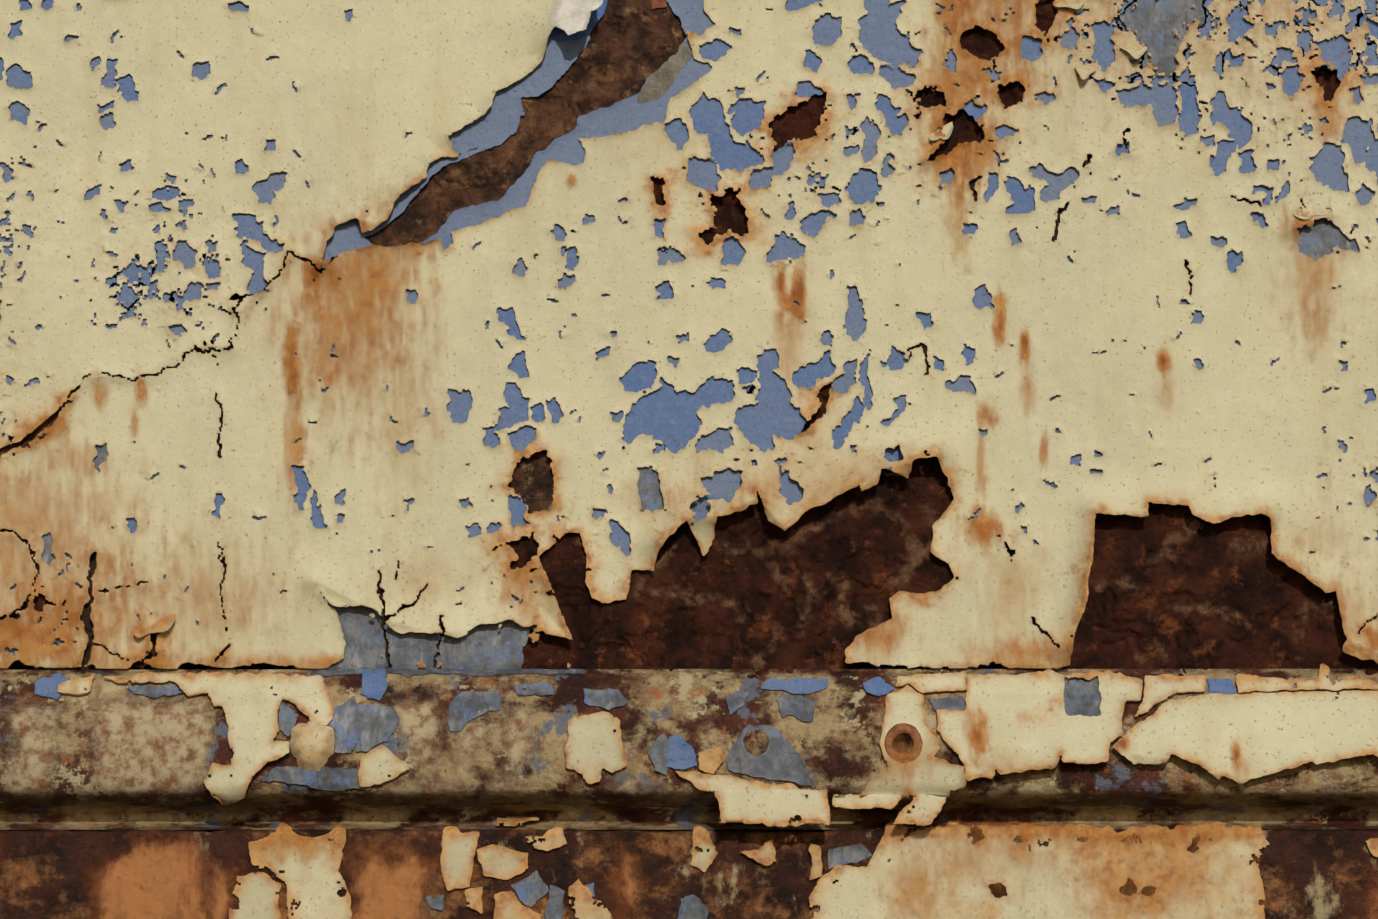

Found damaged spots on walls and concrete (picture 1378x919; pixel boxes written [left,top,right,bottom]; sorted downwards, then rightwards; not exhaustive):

peeling [320,0,800,269]
corrosion [699,187,749,245]
corrosion [768,92,832,152]
peeling [766,0,923,263]
corrosion [912,0,1025,224]
peeling [1020,0,1290,228]
peeling [1271,2,1378,206]
crack [80,551,148,670]
crack [376,561,446,668]
corrosion [495,450,959,679]
corrosion [1011,502,1378,676]
peeling [676,664,1378,919]